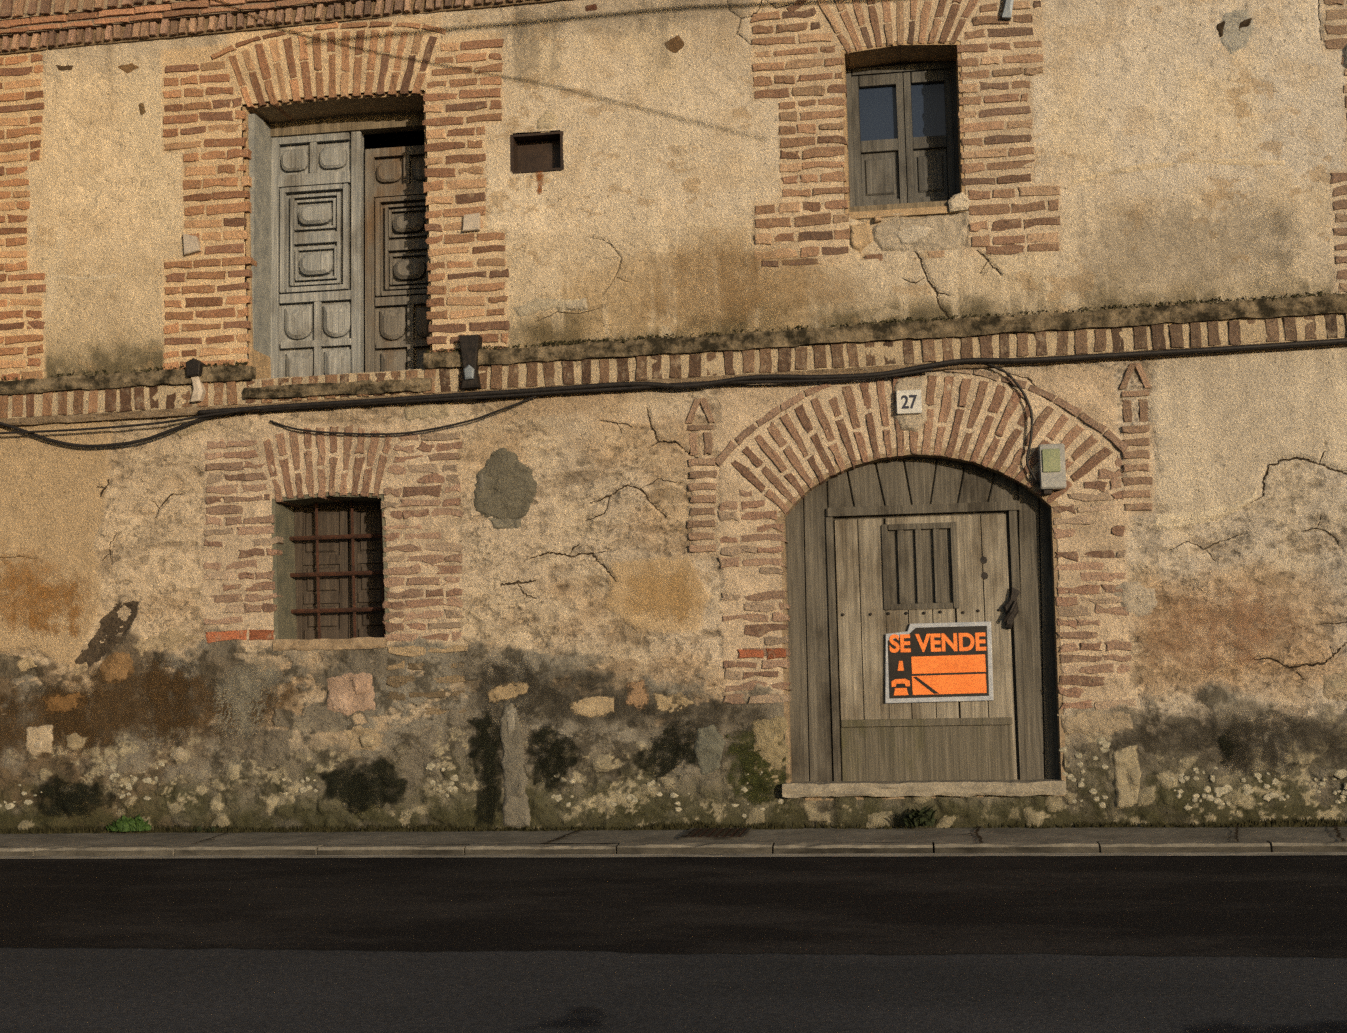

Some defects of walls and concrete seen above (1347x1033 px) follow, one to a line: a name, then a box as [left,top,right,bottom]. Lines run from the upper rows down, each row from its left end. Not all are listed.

crack [903,251,950,319]
crack [977,250,1002,275]
crack [501,408,698,599]
flaking render [1152,490,1257,530]
flaking render [1113,581,1158,617]
crack [1247,622,1347,677]
damp [0,662,293,749]
flaking render [1323,670,1347,701]
damp [469,668,788,826]
damp [1118,717,1347,767]
mould [32,777,116,816]
mould [320,757,408,813]